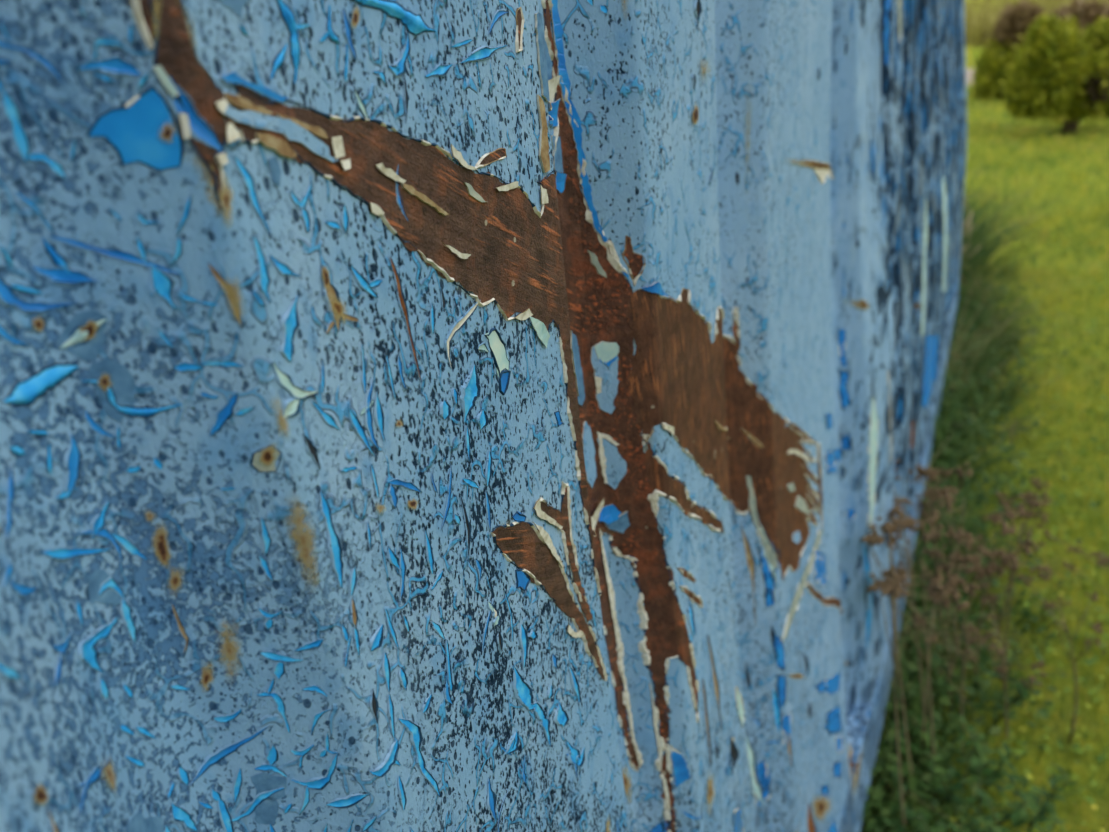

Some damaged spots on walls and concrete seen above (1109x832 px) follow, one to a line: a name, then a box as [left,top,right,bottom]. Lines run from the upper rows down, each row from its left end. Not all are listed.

peeling [214,93,338,187]
peeling [535,13,563,173]
peeling [463,182,486,202]
peeling [485,328,511,396]
peeling [570,331,619,414]
corrosion [260,447,275,465]
peeling [582,421,627,489]
corrosion [146,512,181,590]
peeling [746,476,780,608]
peeling [773,529,827,744]
peeling [730,686,771,809]
peeling [816,672,843,799]